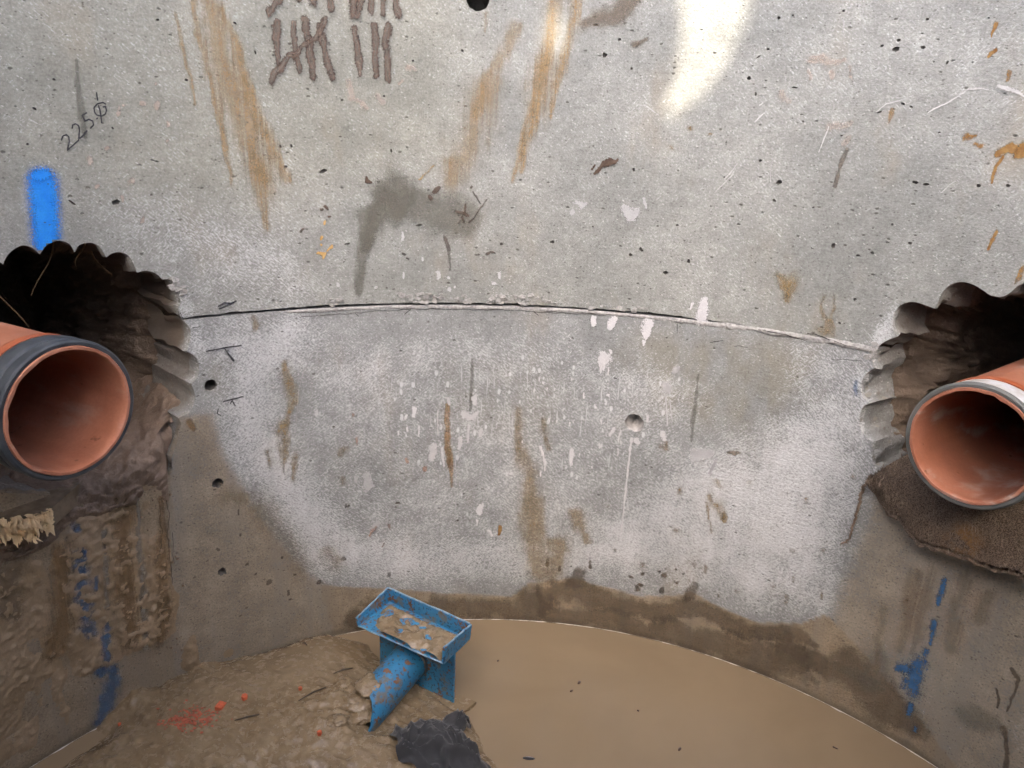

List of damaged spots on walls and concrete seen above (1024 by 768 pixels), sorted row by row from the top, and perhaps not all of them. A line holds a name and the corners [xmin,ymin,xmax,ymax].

rust [191,0,291,229]
rust [511,0,581,181]
rust [991,141,1024,184]
crack [180,302,683,330]
crack [710,330,860,361]
rust [515,408,565,579]